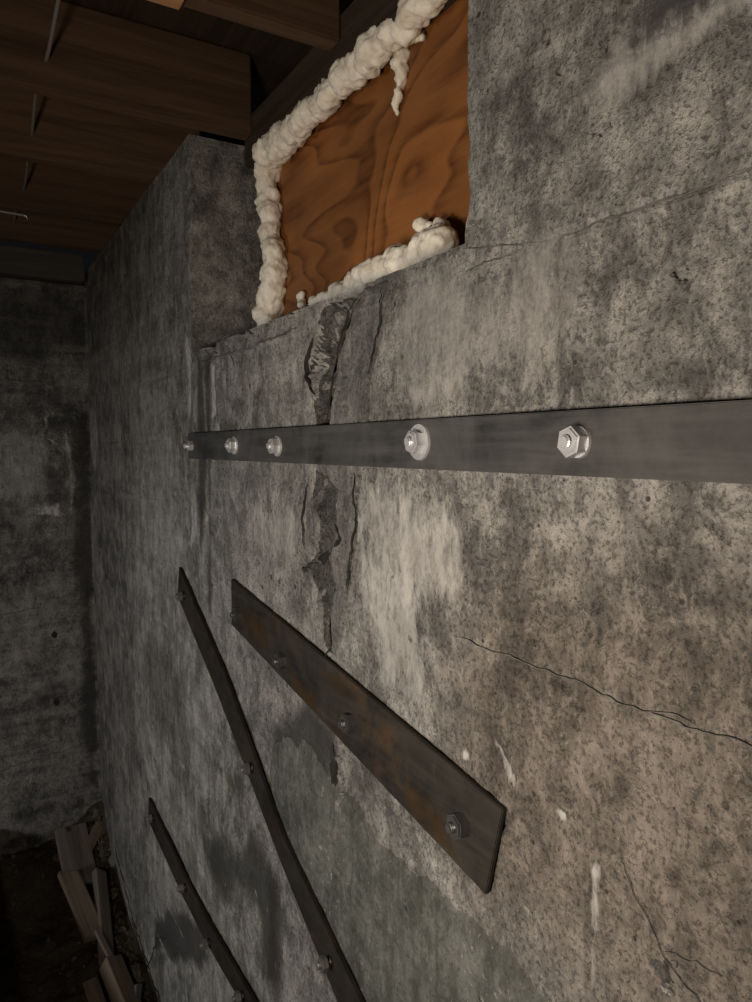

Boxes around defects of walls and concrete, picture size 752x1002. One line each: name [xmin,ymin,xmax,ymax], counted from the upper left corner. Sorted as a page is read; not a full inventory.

crack [454,635,752,748]